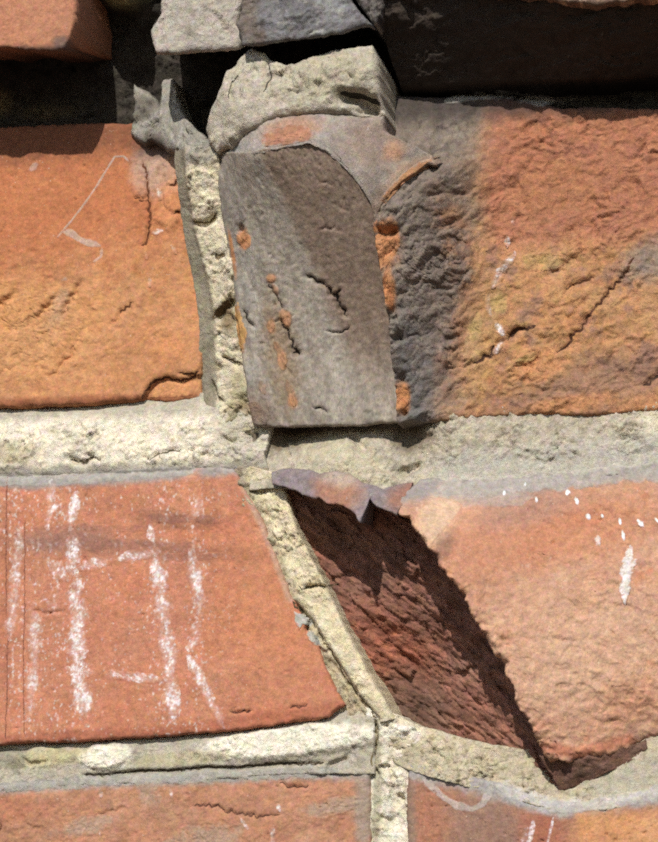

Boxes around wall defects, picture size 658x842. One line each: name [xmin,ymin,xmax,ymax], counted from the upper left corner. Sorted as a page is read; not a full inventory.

spalling [383,0,658,98]
crack [174,211,217,224]
crack [142,371,225,402]
spalling [271,468,564,786]